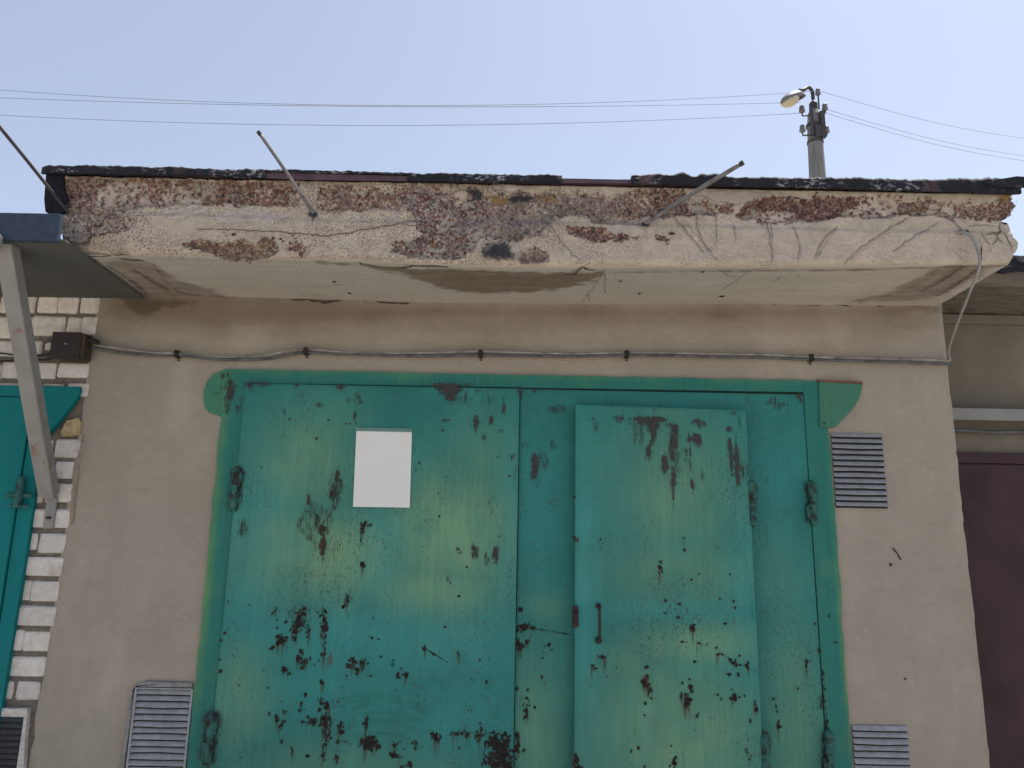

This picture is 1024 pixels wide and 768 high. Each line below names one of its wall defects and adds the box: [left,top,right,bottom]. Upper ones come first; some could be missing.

spalling [61,176,300,242]
spalling [181,233,311,264]
crack [199,220,438,236]
damp [369,236,603,293]
spalling [315,183,1017,264]
crack [674,212,837,306]
crack [845,217,1013,265]
corrosion [614,416,705,510]
corrosion [297,470,343,563]
corrosion [269,604,329,675]
corrosion [268,679,418,768]
corrosion [430,722,526,768]